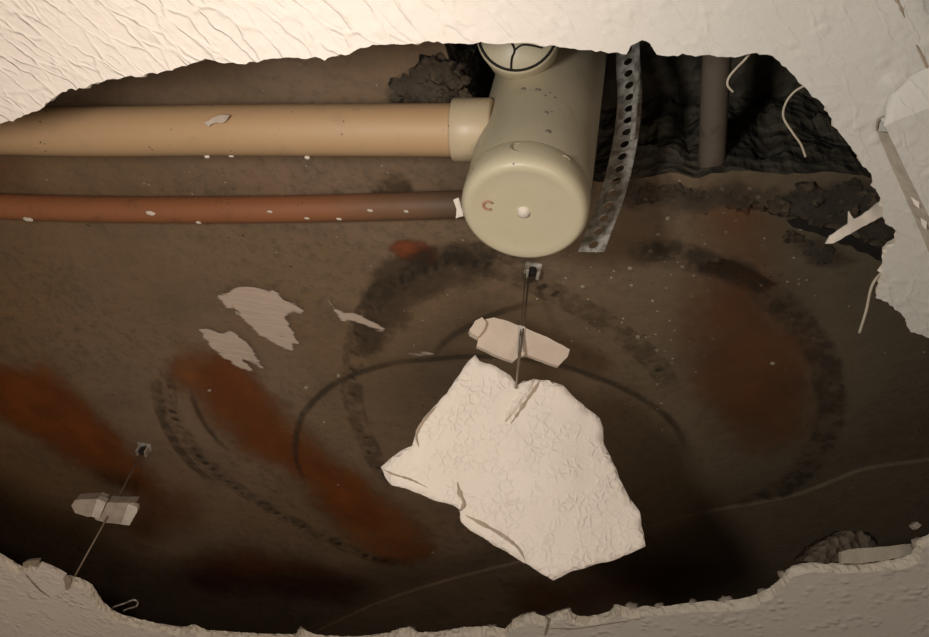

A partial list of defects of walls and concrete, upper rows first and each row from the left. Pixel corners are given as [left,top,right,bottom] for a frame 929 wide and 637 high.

spalling [388,41,495,103]
spalling [593,40,897,295]
rust [172,356,431,562]
spalling [0,553,41,574]
spalling [68,534,929,637]